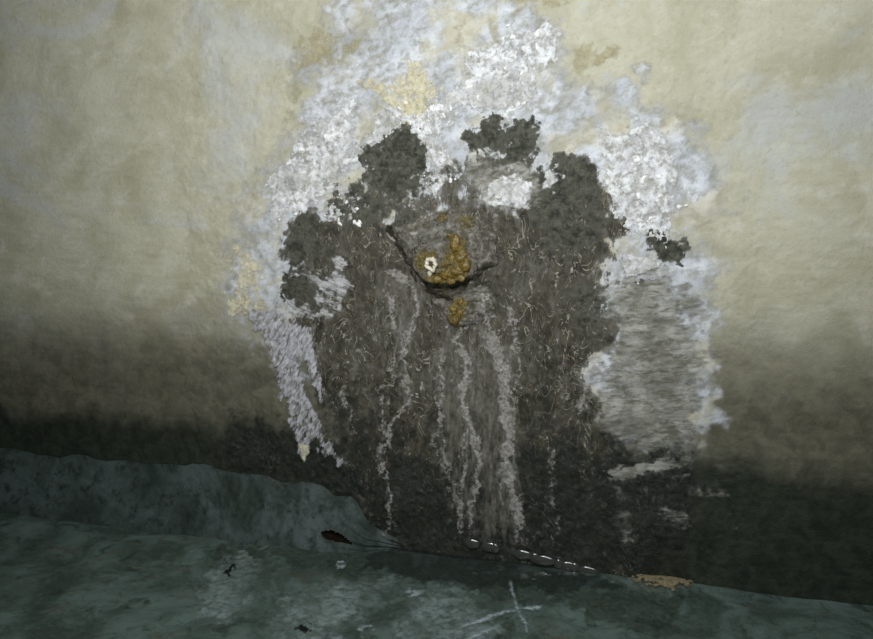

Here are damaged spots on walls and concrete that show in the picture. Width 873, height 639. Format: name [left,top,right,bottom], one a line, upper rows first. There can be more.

crack [385,226,478,314]
corrosion [414,214,477,290]
corrosion [446,296,469,327]
leakage [193,0,728,639]